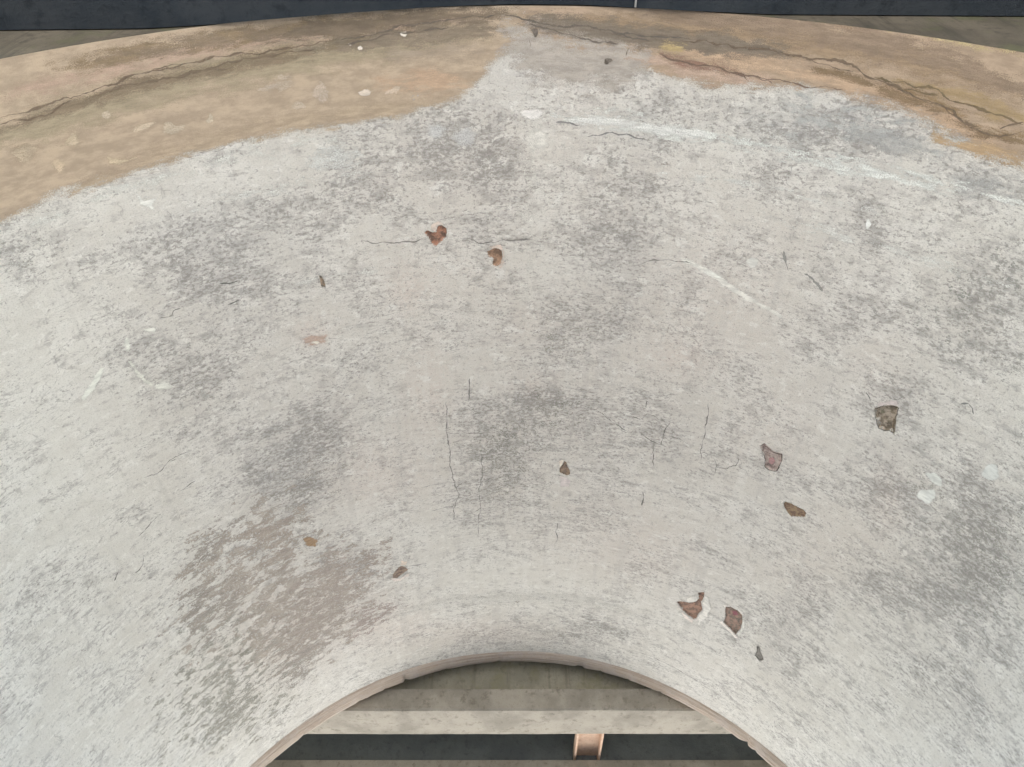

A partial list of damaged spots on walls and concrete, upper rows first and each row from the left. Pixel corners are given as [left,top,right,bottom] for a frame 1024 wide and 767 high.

crack [1,14,1023,137]
damp [0,6,1024,273]
crack [426,378,483,534]
flaking render [675,591,745,639]